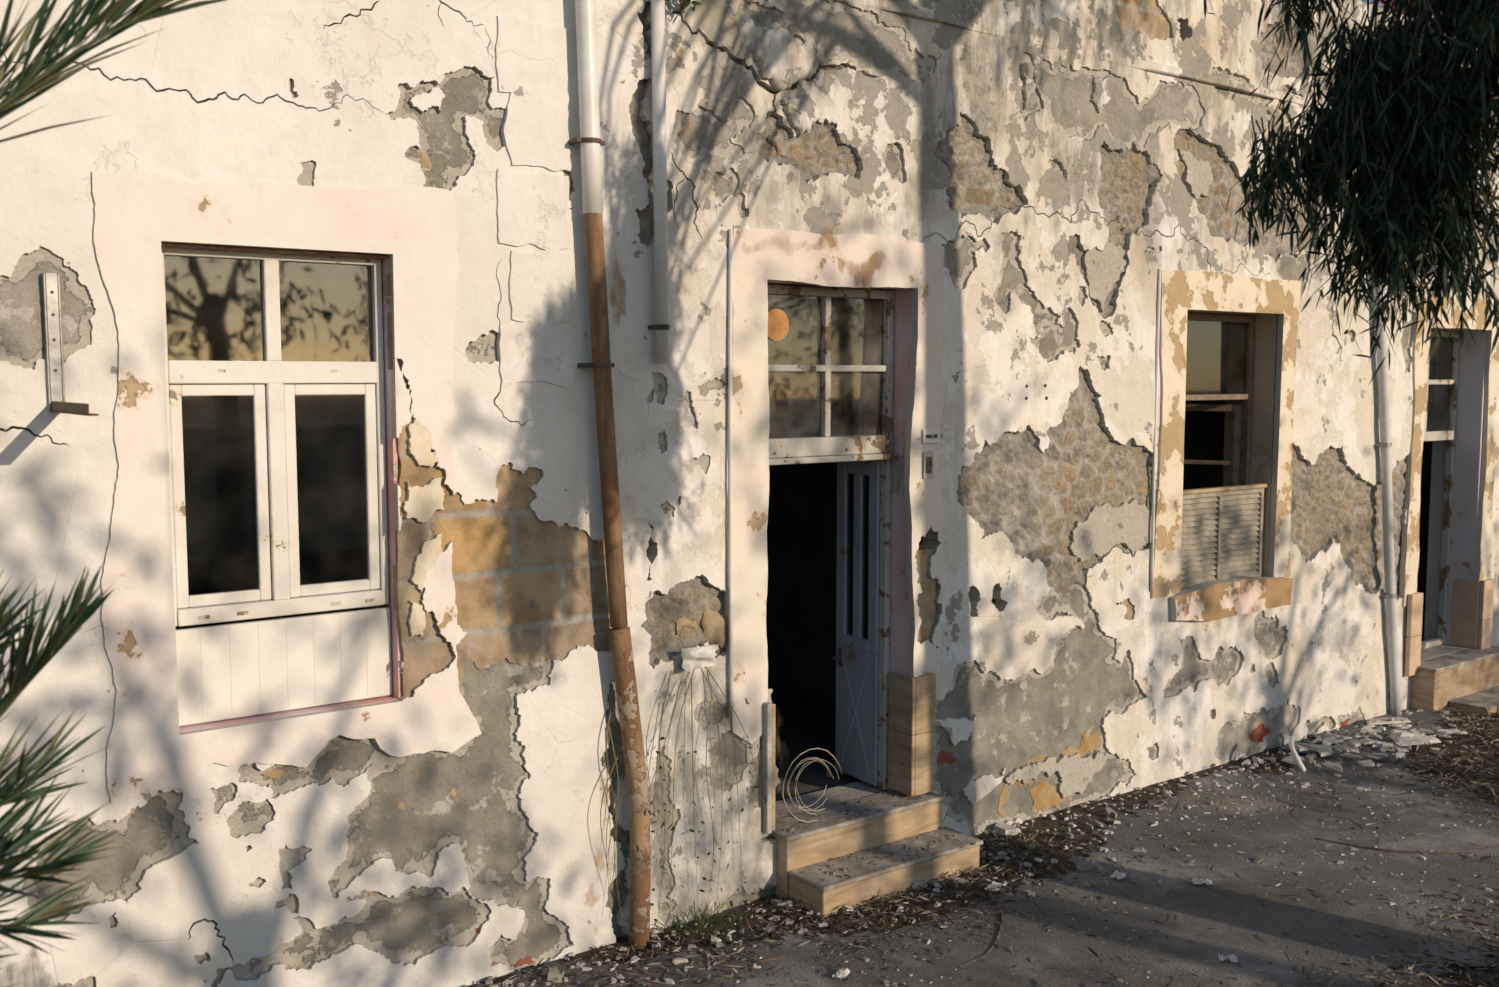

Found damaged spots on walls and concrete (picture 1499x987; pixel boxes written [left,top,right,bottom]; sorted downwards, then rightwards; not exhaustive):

crack [90,69,361,112]
spalling [385,67,505,190]
spalling [0,246,95,370]
crack [0,426,66,445]
spalling [194,418,612,987]